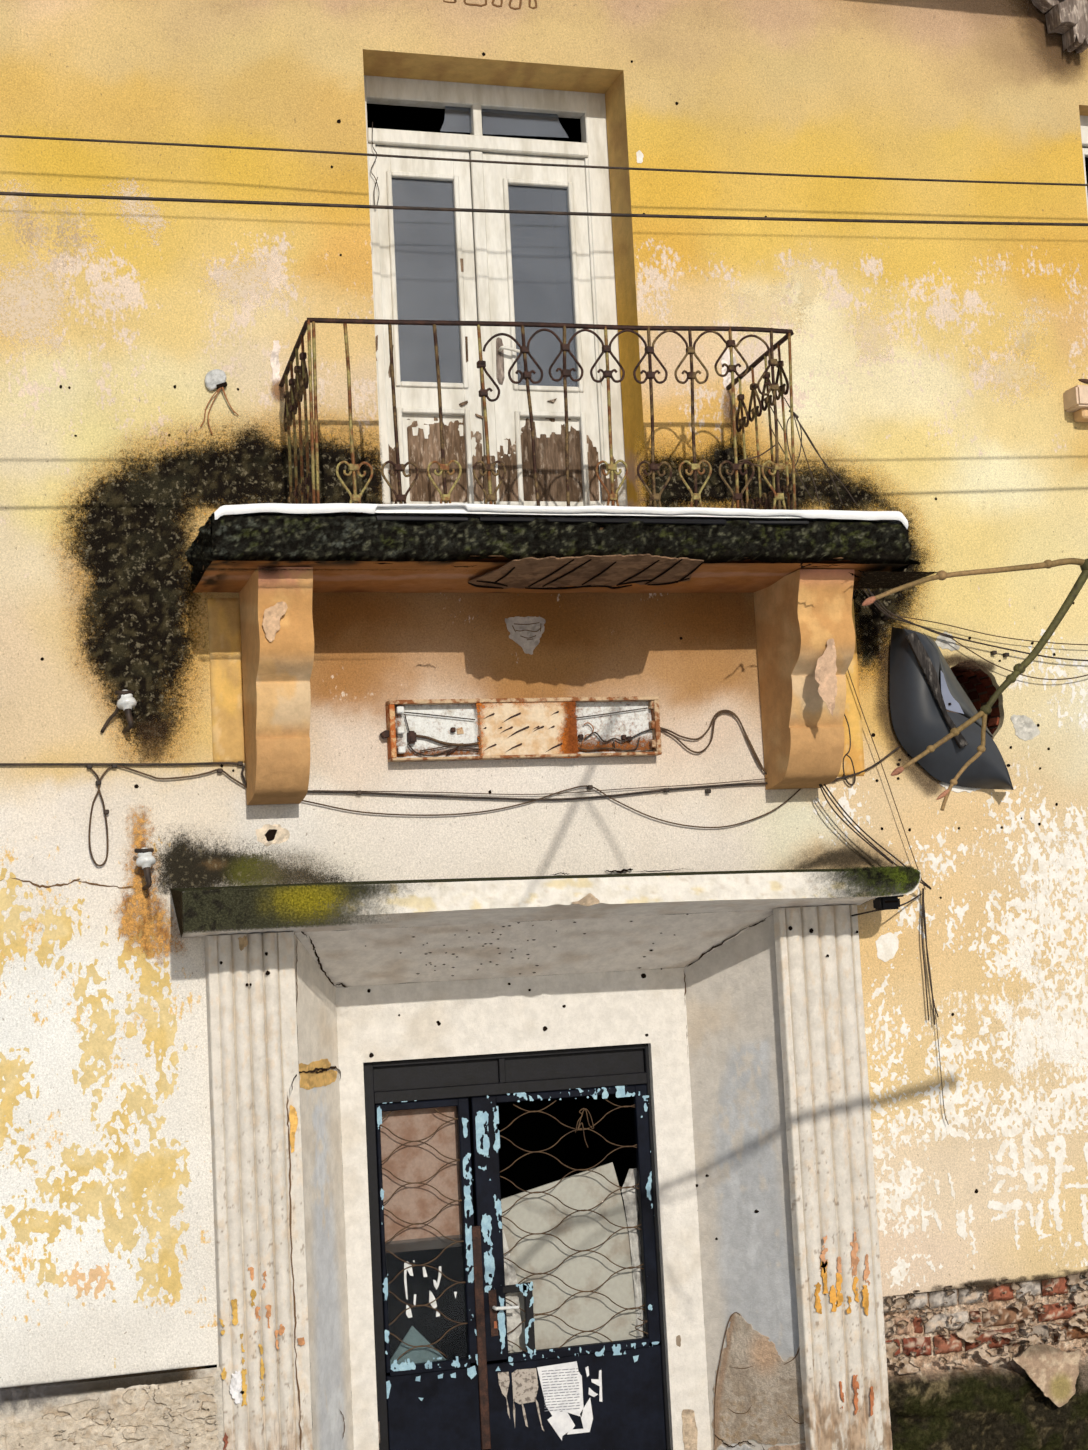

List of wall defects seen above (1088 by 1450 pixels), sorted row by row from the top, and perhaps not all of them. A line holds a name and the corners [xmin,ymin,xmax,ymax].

rust [723,391,732,425]
water stain [54,417,384,763]
water stain [637,438,937,677]
peeling [815,638,837,716]
spalling [935,619,1088,741]
rust [118,806,183,964]
water stain [153,830,359,895]
water stain [794,845,894,870]
peeling [0,868,192,1309]
peeling [814,782,1088,1407]
crack [286,931,348,1450]
flaking render [682,1312,806,1450]